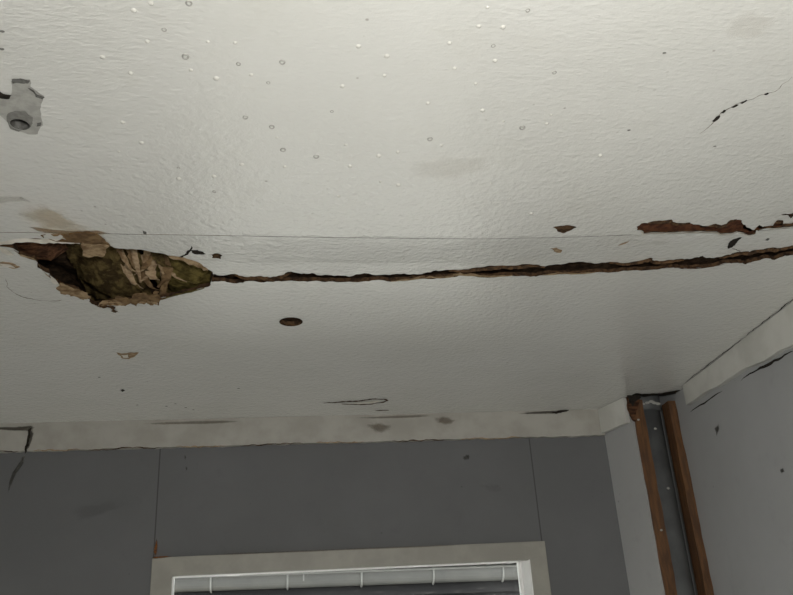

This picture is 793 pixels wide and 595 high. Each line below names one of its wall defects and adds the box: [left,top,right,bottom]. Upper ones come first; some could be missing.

spalling [12,78,44,100]
crack [701,77,792,133]
peeling [637,213,793,251]
peeling [0,238,80,269]
peeling [180,246,222,259]
crack [210,245,793,283]
crack [3,428,219,489]
crack [240,439,364,447]
crack [394,435,520,443]